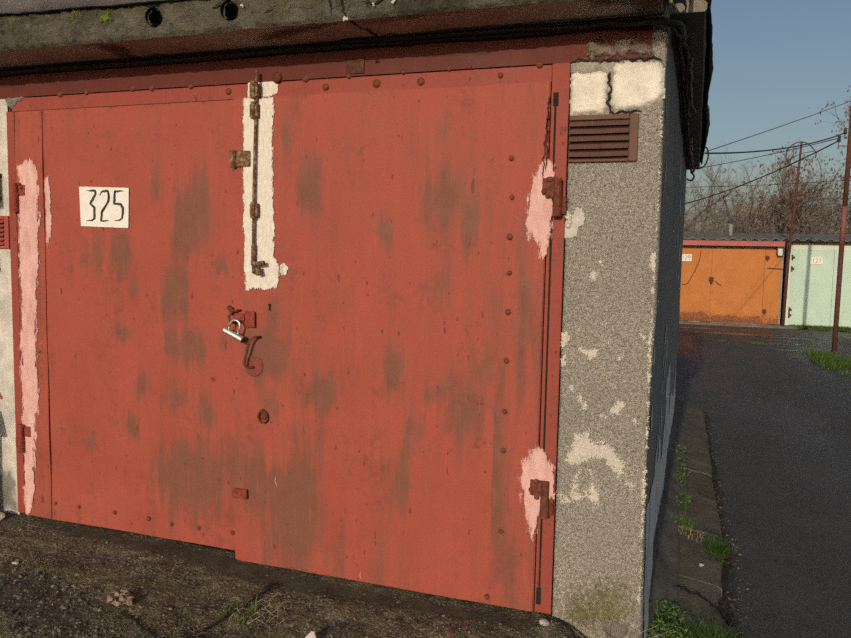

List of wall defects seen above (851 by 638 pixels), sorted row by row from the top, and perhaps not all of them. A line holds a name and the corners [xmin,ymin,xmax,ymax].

crack [328,0,380,37]
rust [542,96,550,176]
spalling [569,36,665,159]
spalling [649,251,657,298]
peeling [557,309,676,638]